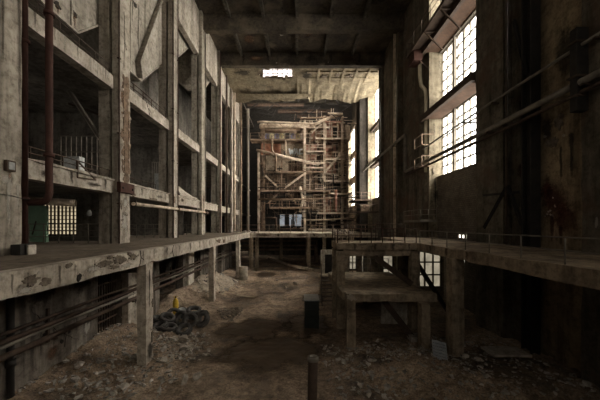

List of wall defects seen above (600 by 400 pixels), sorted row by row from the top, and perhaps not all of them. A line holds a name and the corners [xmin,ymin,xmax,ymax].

spalling [94,252,139,270]
spalling [18,271,56,289]